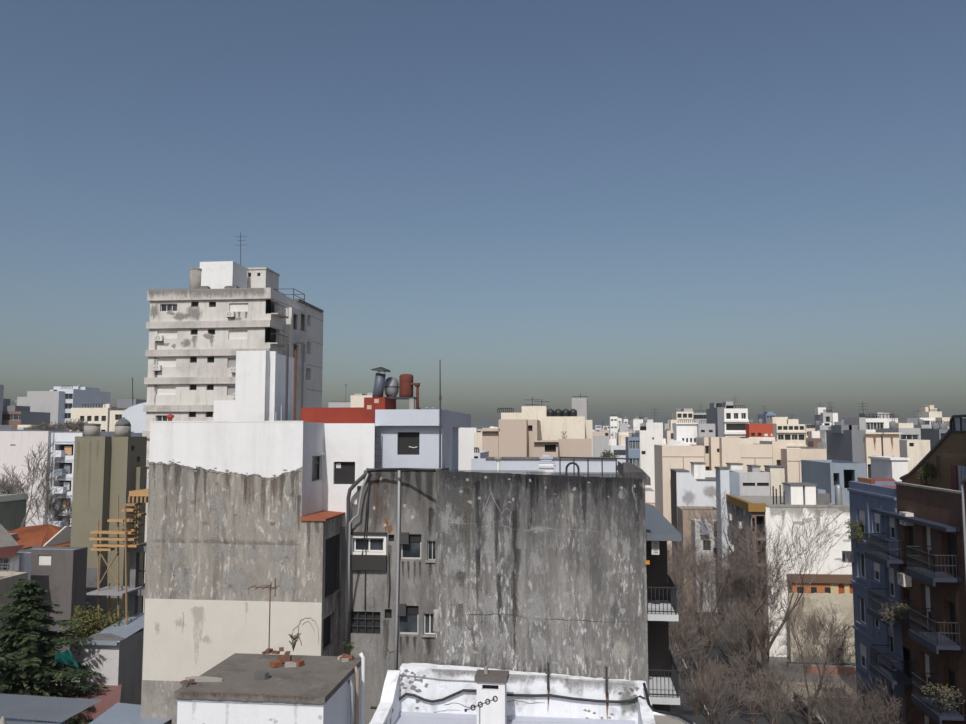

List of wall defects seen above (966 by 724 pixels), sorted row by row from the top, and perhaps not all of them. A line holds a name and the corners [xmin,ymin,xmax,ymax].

peeling [148,460,301,485]
leakage [376,470,645,663]
leakage [432,625,477,675]
leakage [508,644,638,712]